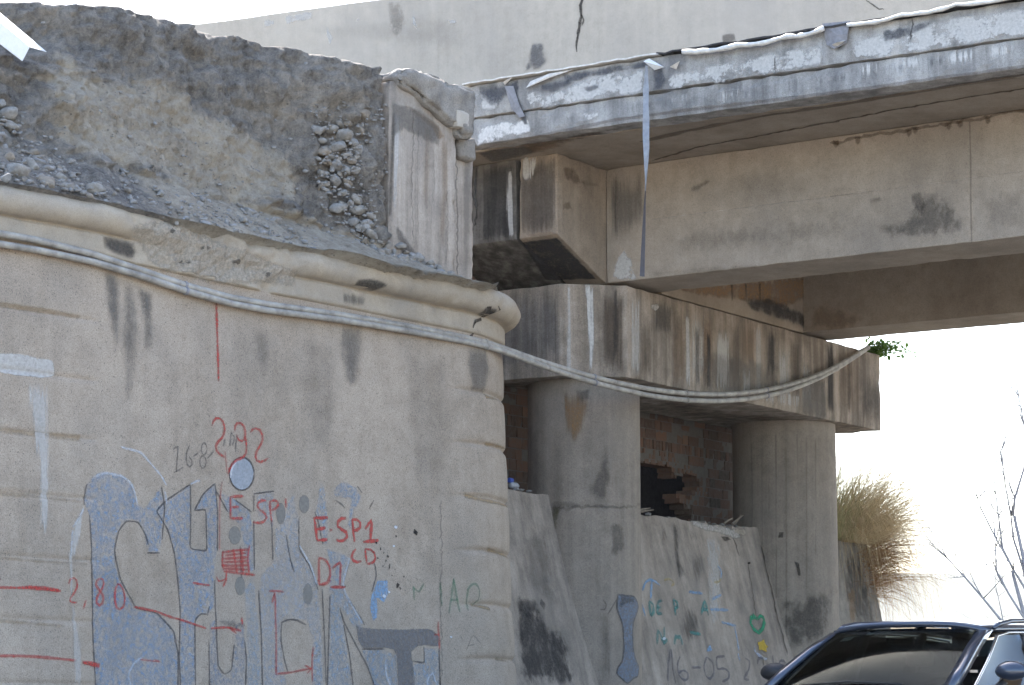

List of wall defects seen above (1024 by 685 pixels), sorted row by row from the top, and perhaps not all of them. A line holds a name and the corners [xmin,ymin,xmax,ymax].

crack [575,0,584,52]
leakage [903,50,972,68]
leakage [992,45,1012,58]
rust [641,74,1024,161]
leakage [477,82,600,239]
leakage [106,238,134,256]
spalling [134,221,295,285]
leakage [614,252,635,279]
leakage [109,278,132,344]
leakage [141,292,150,334]
leakage [519,602,572,683]